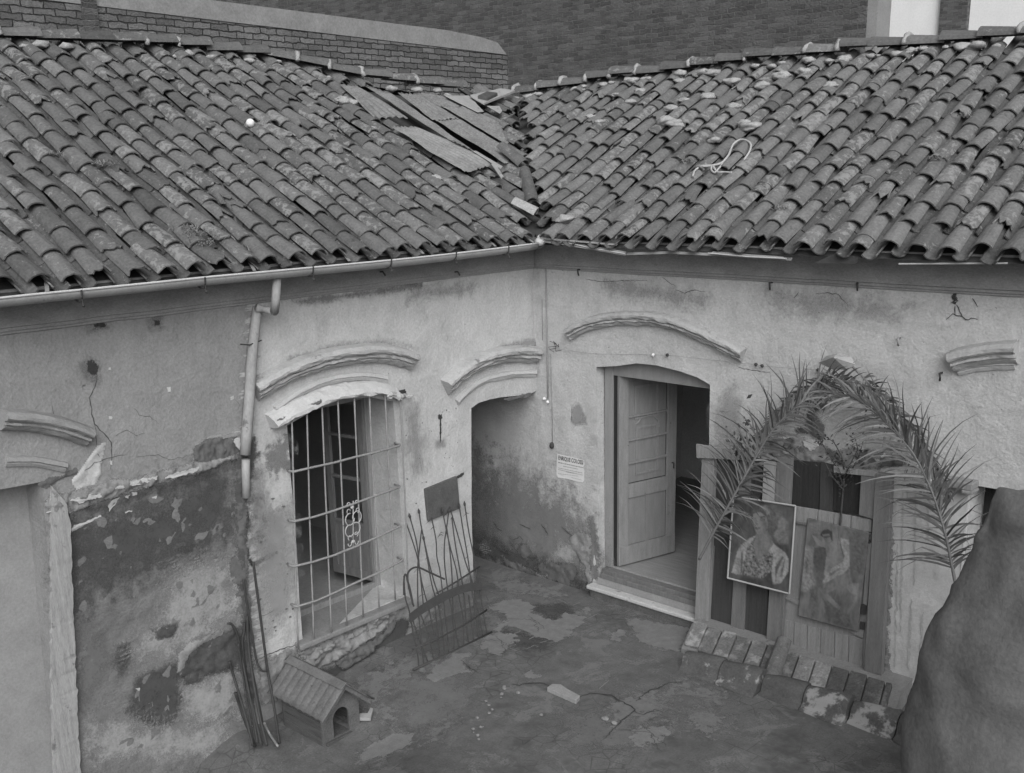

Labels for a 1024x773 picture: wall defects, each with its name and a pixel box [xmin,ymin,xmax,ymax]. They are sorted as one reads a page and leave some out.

crack [89,377,184,461]
damp [471,443,605,591]
flaking render [38,432,443,773]
crack [580,682,675,752]